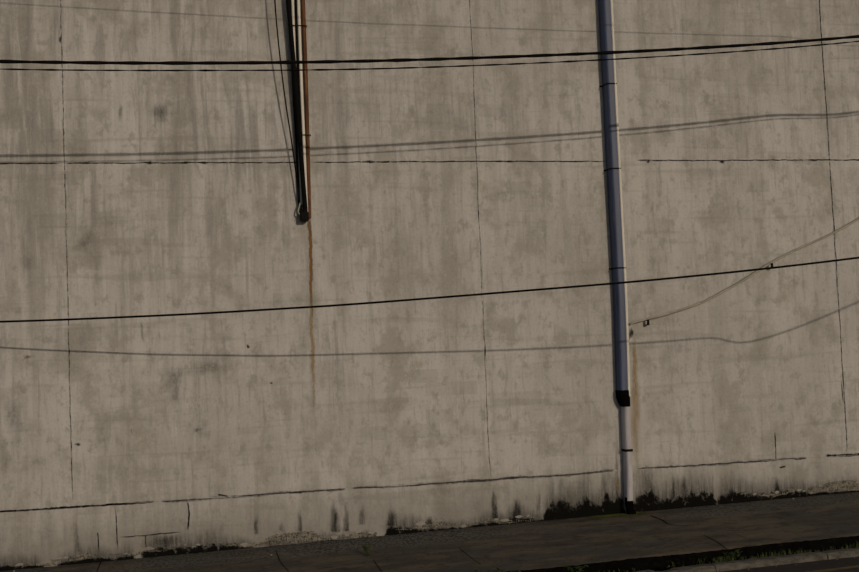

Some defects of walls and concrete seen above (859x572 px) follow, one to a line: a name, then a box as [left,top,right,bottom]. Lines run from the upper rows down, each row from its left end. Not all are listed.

rust [307,218,315,374]
leakage [385,478,859,535]